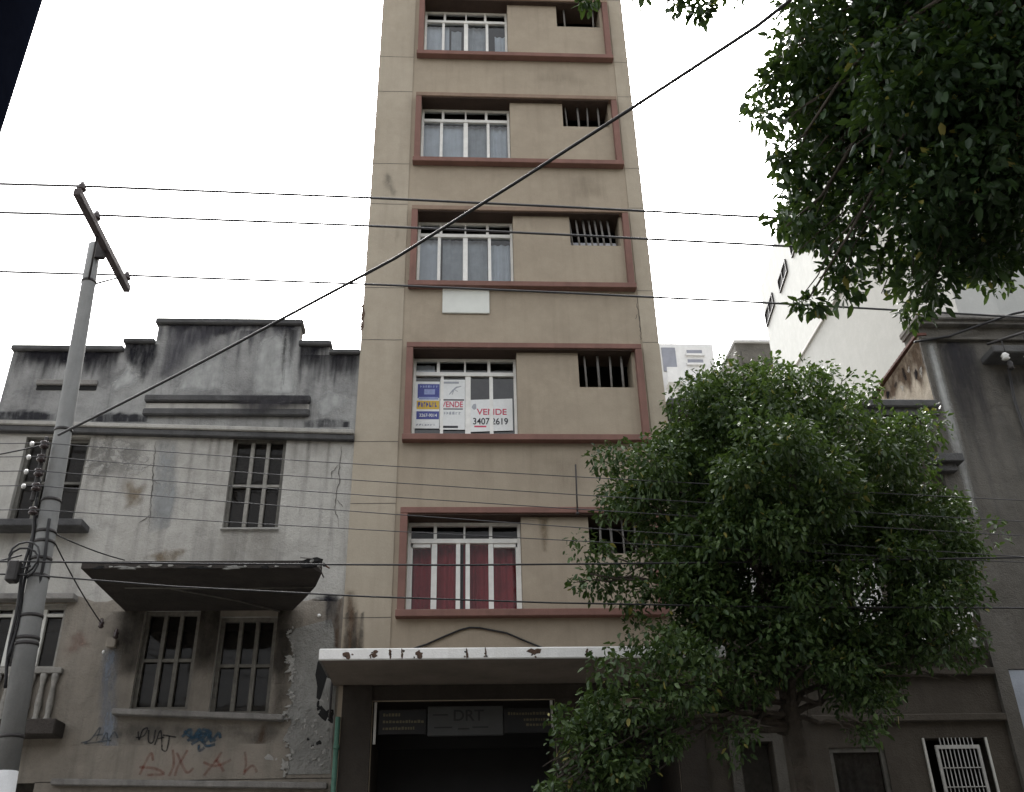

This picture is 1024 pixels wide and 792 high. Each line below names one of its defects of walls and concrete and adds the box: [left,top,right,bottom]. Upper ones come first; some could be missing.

water stain [24,351,69,365]
water stain [83,325,357,412]
water stain [0,410,50,420]
water stain [91,412,147,422]
water stain [305,393,349,427]
crack [138,443,160,525]
crack [331,451,343,527]
flaking render [264,619,354,778]